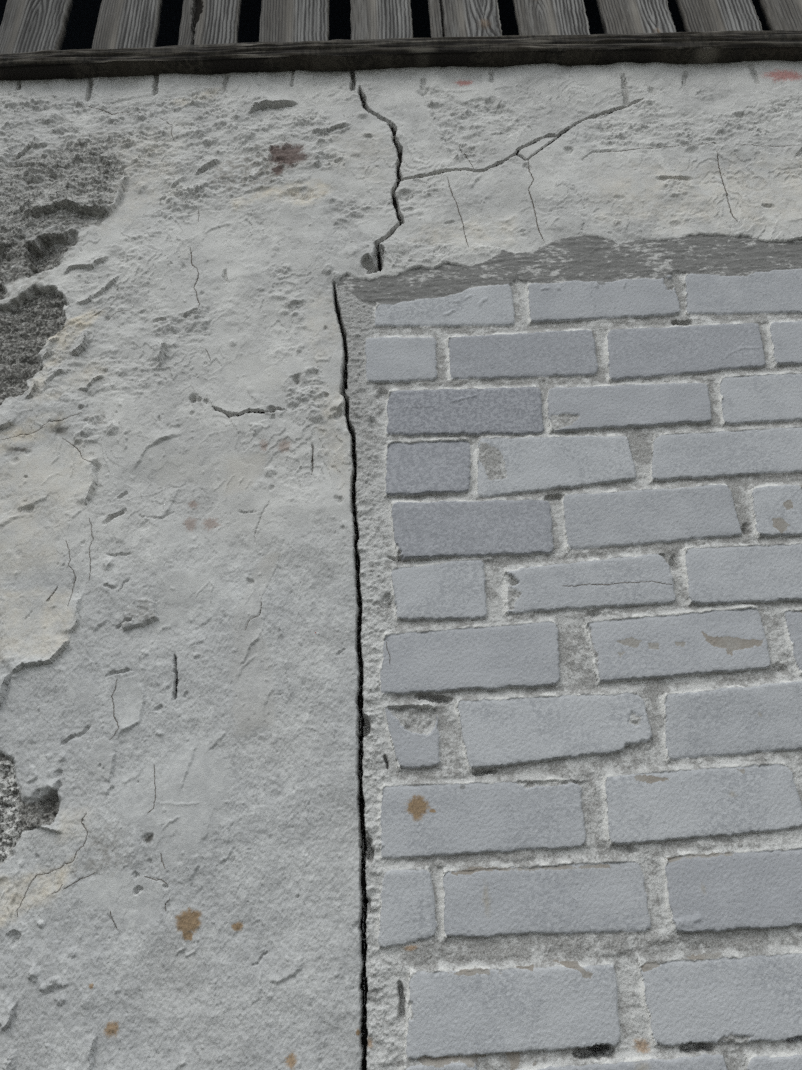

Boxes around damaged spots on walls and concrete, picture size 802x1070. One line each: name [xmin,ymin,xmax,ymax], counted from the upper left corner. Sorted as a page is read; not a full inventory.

spalling [0,122,136,239]
crack [359,90,403,272]
crack [443,128,571,247]
spalling [0,289,66,406]
spalling [0,489,58,530]
crack [563,579,672,587]
spalling [0,593,88,711]
crack [334,288,390,1070]
spalling [387,701,439,737]
spalling [0,753,62,865]
rust [401,789,438,824]
rust [171,904,207,943]